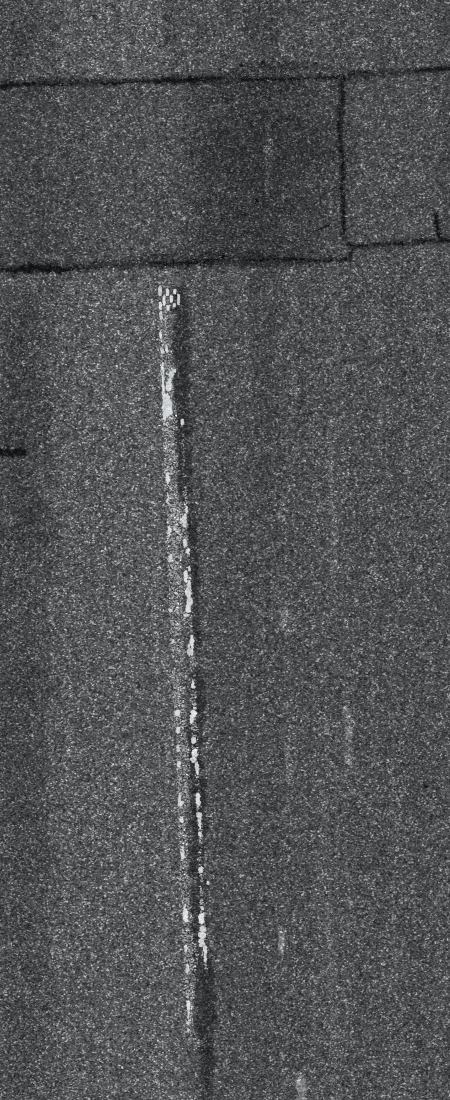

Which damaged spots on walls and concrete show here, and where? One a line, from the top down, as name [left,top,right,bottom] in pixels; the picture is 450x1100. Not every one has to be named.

crack [0,59,450,276]
crack [0,446,26,457]
damp [171,285,202,652]
damp [187,671,217,1100]